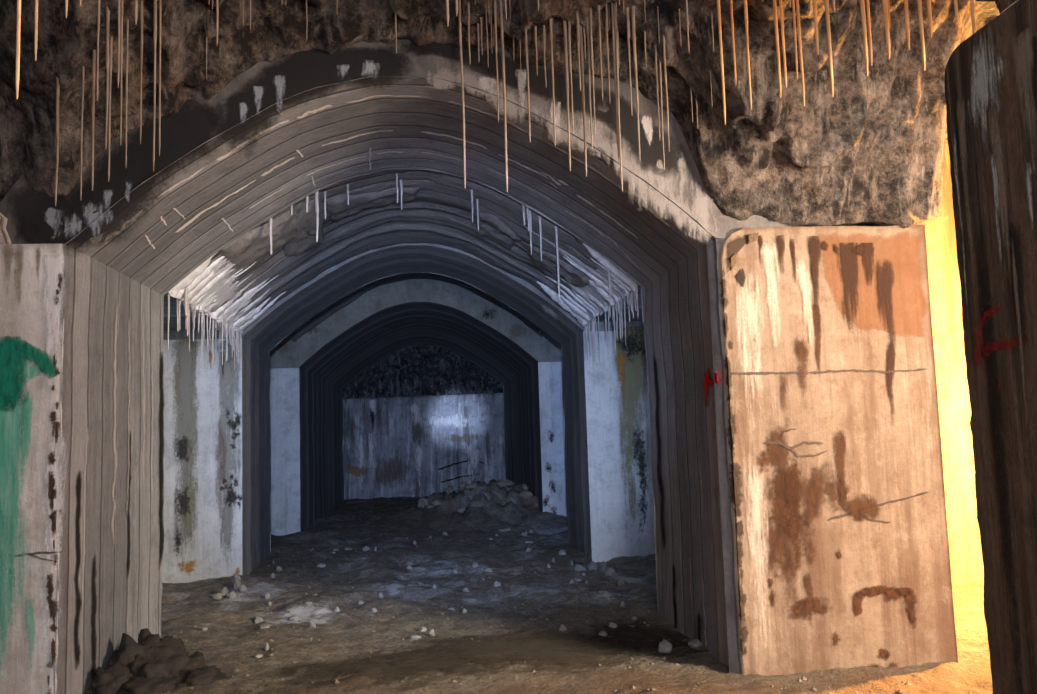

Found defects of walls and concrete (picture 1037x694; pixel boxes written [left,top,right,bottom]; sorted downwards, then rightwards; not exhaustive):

water stain [4,247,23,294]
rust [758,430,880,619]
rust [853,585,917,627]
rust [867,649,897,667]